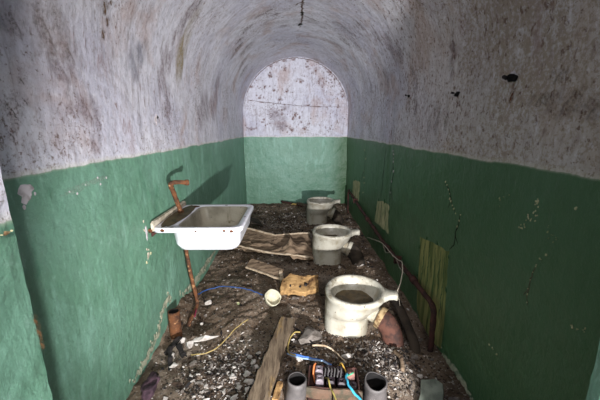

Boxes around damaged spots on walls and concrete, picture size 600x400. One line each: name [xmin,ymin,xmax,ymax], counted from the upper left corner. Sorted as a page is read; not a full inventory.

crack [296,0,316,27]
peeling [17,184,36,210]